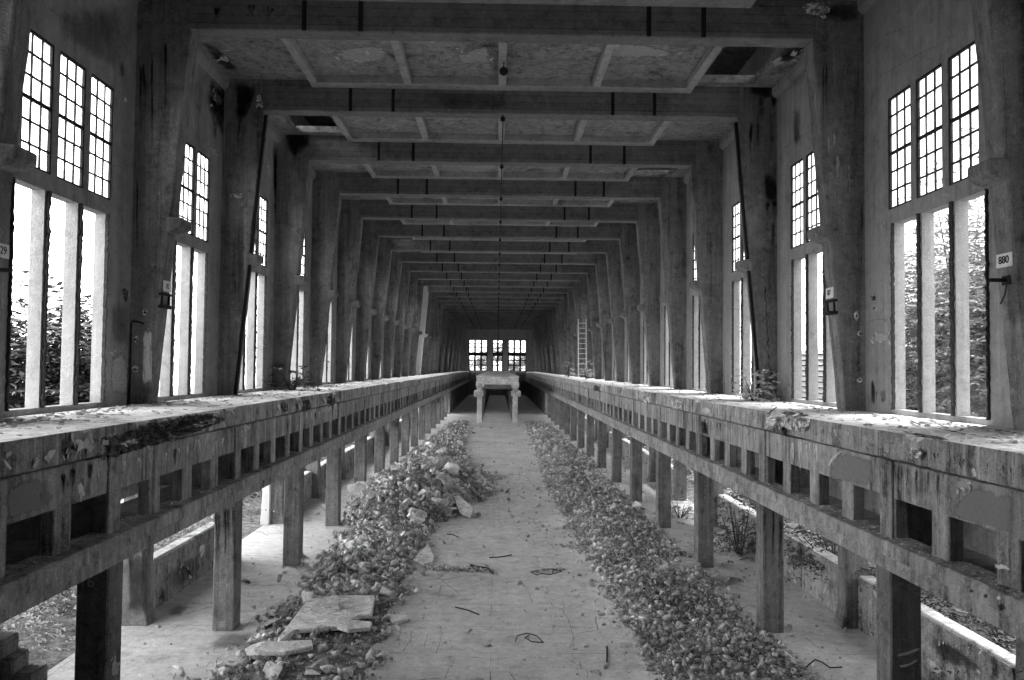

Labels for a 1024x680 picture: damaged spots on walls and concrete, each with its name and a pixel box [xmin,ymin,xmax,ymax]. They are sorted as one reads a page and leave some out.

leakage [764,175,777,210]
spalling [62,413,225,461]
spalling [765,410,813,435]